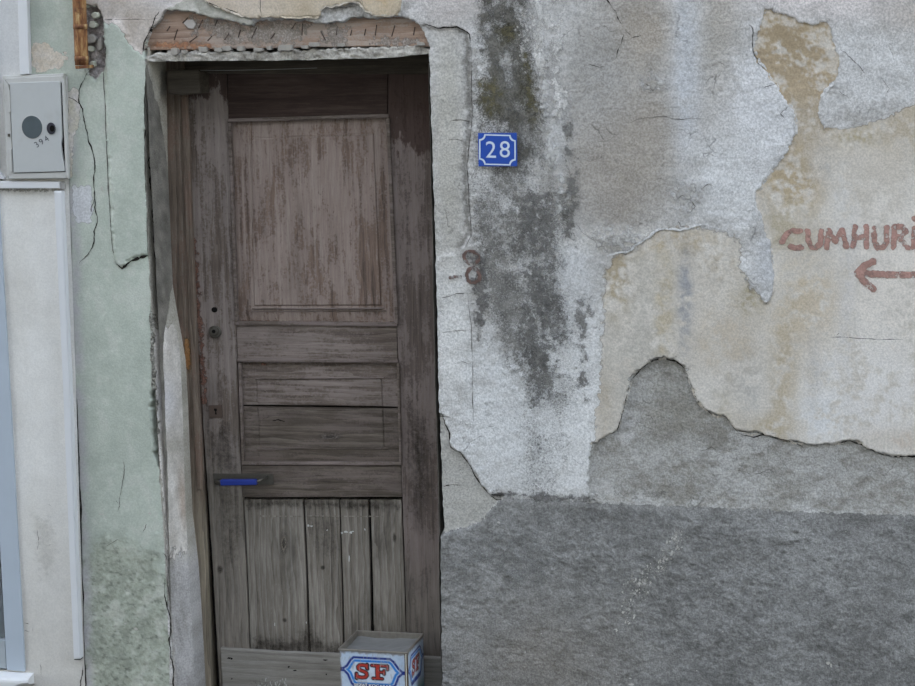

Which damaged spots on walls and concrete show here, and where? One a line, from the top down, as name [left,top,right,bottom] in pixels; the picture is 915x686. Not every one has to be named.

crack [107,12,159,50]
peeling [86,0,402,79]
peeling [514,0,572,120]
crack [69,47,114,263]
crack [148,157,156,259]
water stain [468,0,580,413]
peeling [587,9,915,517]